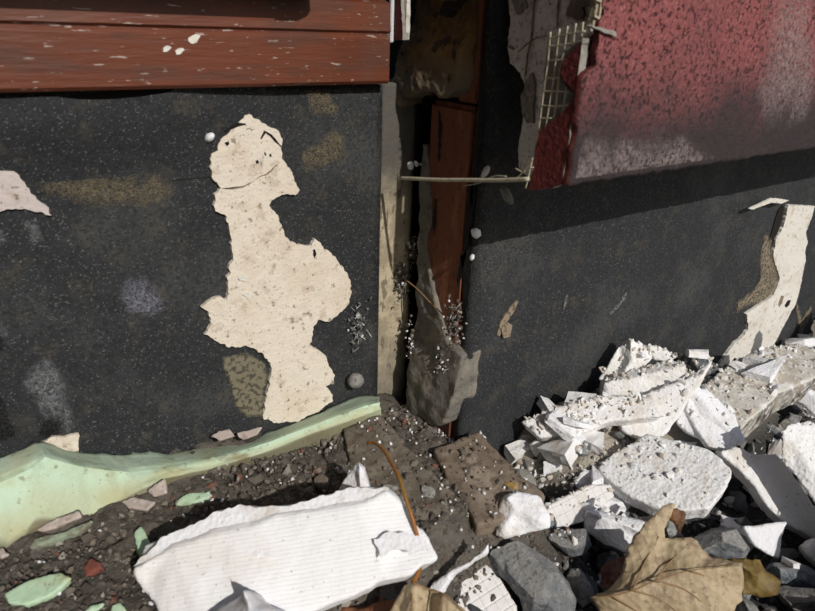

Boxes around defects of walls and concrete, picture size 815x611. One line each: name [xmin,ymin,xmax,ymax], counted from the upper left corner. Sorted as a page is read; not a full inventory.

spalling [507,0,548,123]
spalling [556,0,591,28]
peeling [0,171,52,216]
peeling [200,114,352,441]
peeling [717,204,815,367]